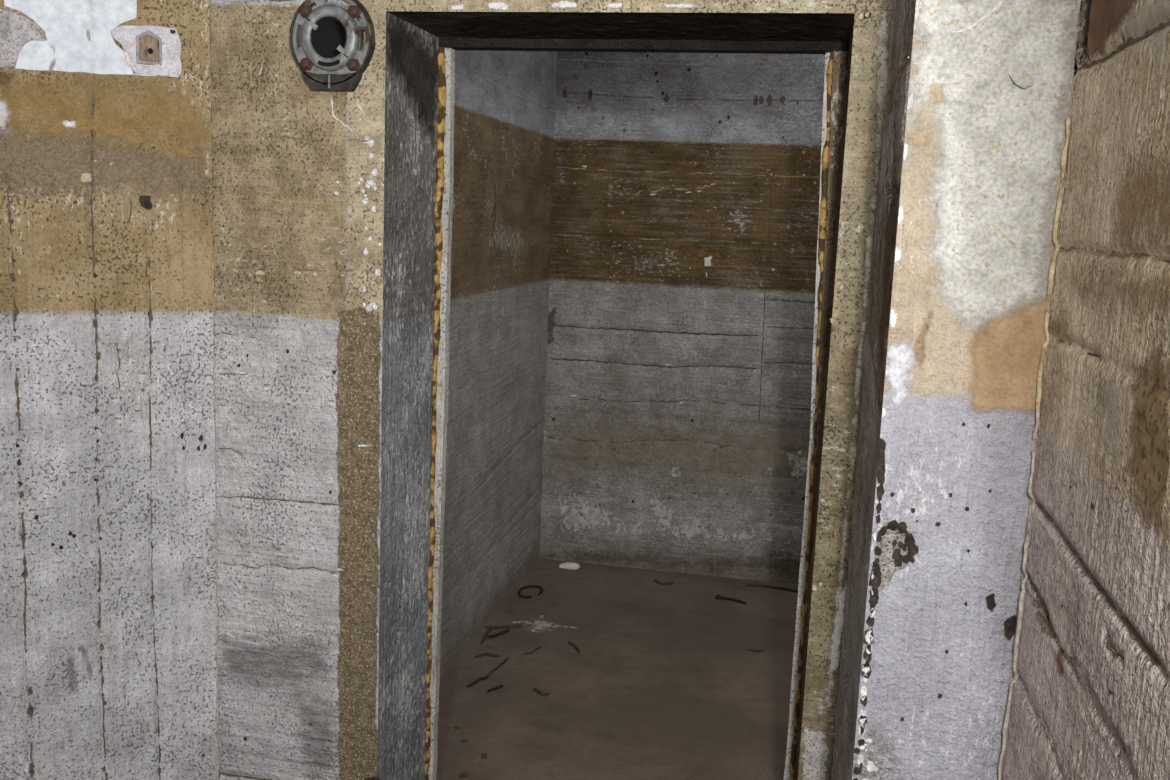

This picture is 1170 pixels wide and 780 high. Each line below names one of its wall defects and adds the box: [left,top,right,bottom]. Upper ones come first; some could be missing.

peeling [0,0,182,77]
crack [1075,21,1170,76]
peeling [825,0,1092,708]
water stain [1128,350,1170,547]
spalling [853,438,919,780]